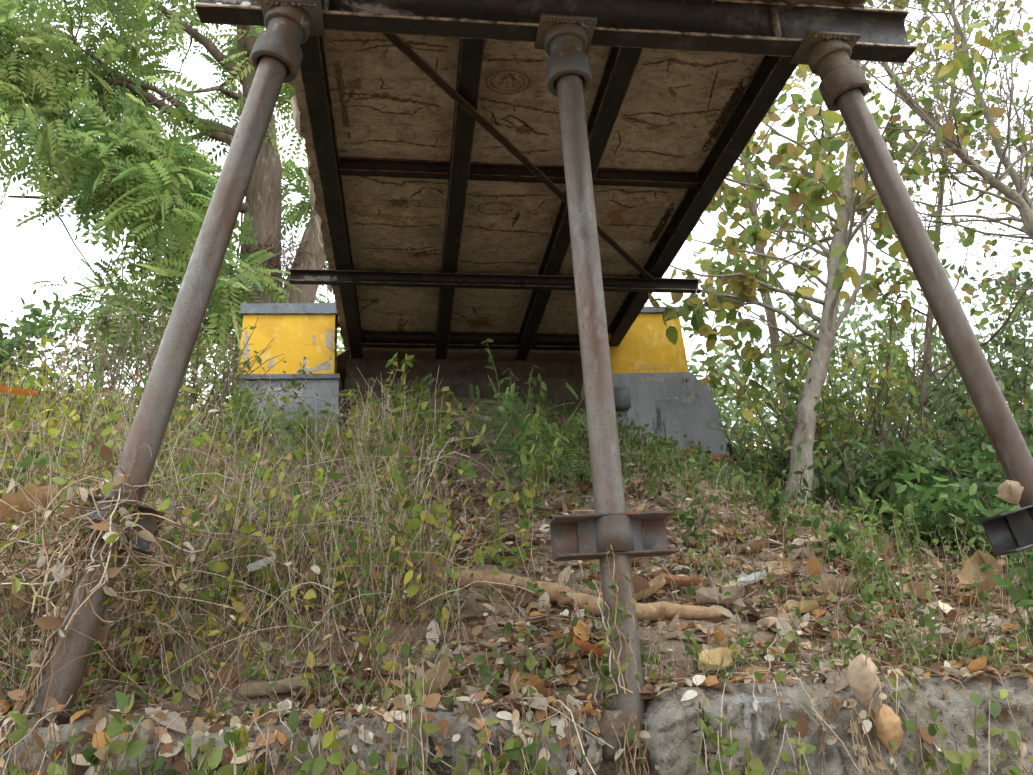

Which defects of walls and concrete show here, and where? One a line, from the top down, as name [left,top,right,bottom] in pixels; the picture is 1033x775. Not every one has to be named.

crack [333,39,455,148]
crack [478,97,559,155]
crack [611,58,738,164]
crack [350,176,550,250]
crack [596,189,668,227]
peeling [296,328,335,372]